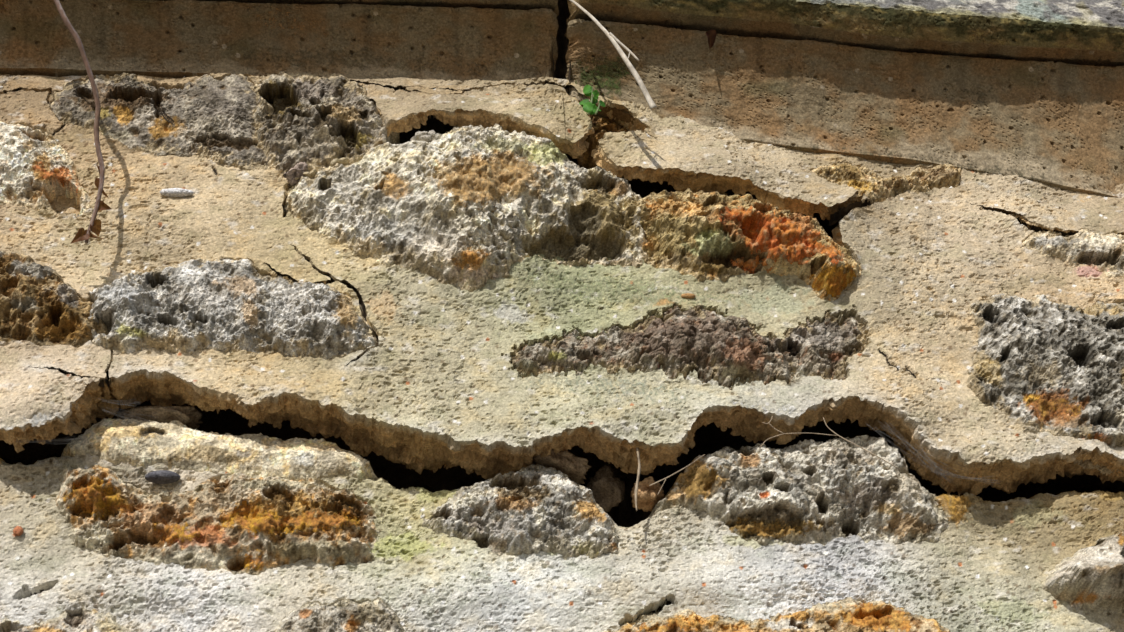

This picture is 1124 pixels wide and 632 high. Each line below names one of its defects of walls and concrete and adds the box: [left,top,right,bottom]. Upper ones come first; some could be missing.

crack [544,0,570,95]
crack [157,106,174,124]
peeling [283,162,309,187]
crack [982,208,1075,236]
peeling [257,242,331,285]
crack [269,259,379,360]
crack [47,368,110,387]
peeling [0,353,1124,513]
crack [1,452,63,465]
crack [360,455,487,493]
crack [579,433,855,527]
crack [907,465,1118,502]